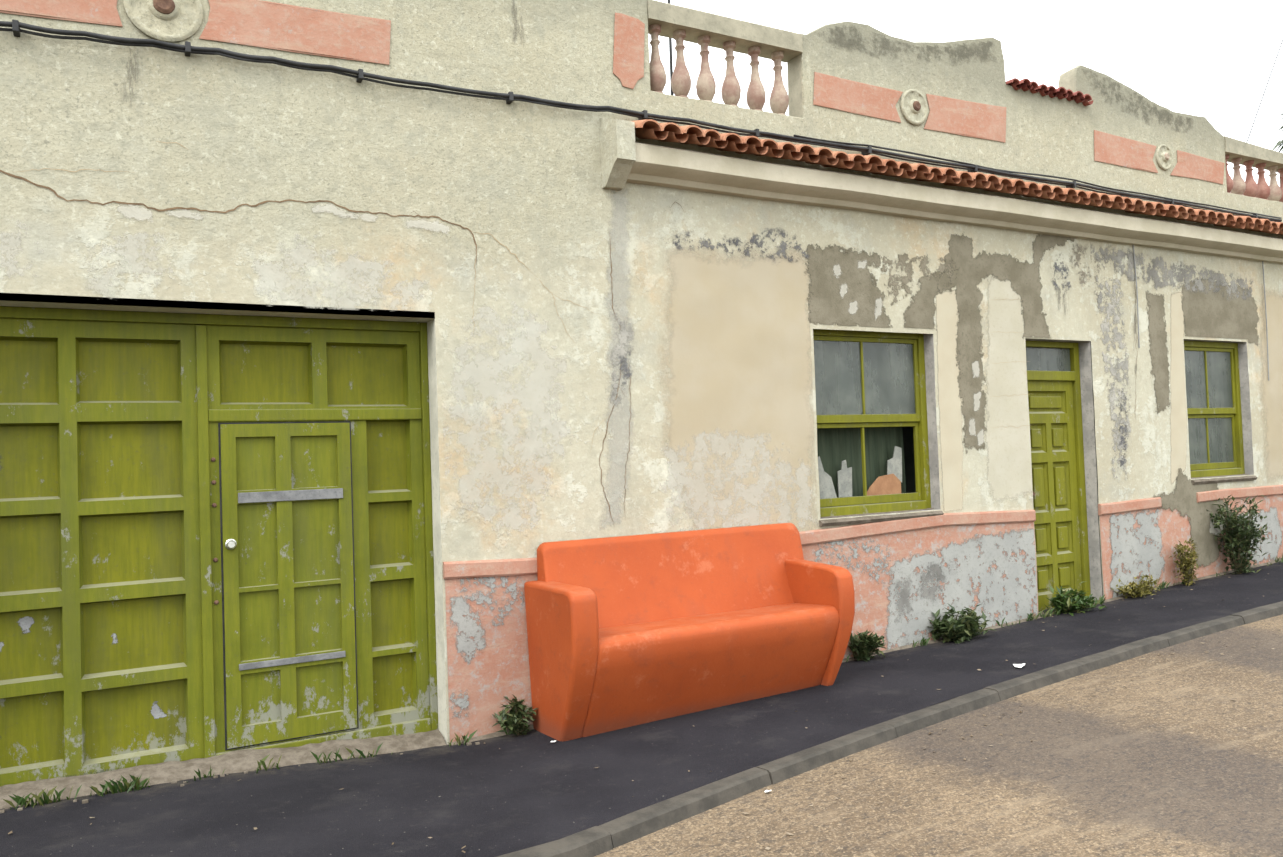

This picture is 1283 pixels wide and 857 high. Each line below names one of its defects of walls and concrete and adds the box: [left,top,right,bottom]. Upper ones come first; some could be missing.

crack [0,168,631,524]
flaking render [804,234,1075,454]
flaking render [1146,290,1171,414]
flaking render [1181,278,1259,345]
peeling [449,575,524,664]
peeling [815,528,1038,650]
peeling [1109,468,1282,598]